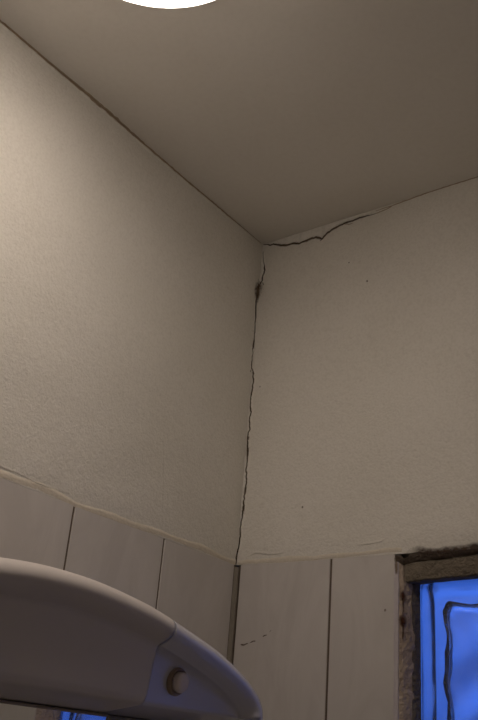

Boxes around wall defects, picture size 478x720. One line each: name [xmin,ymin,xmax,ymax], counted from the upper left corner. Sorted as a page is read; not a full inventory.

crack [0,20,478,565]